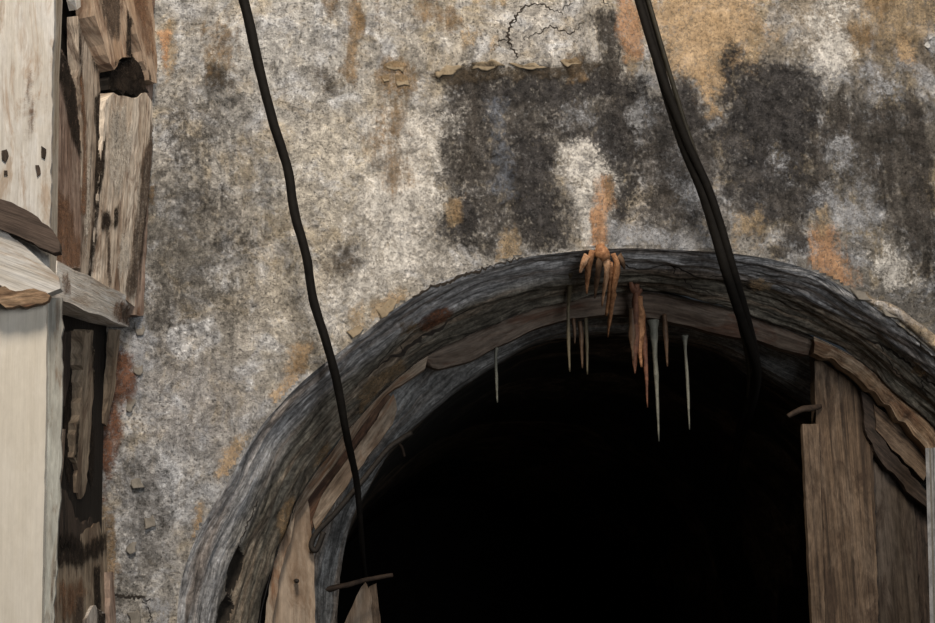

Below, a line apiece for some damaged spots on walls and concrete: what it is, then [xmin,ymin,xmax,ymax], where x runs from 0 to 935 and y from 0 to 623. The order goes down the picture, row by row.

crack [493,0,581,60]
water stain [290,8,713,345]
corrosion [590,175,614,245]
water stain [672,0,935,299]
corrosion [808,205,852,285]
corrosion [103,351,136,478]